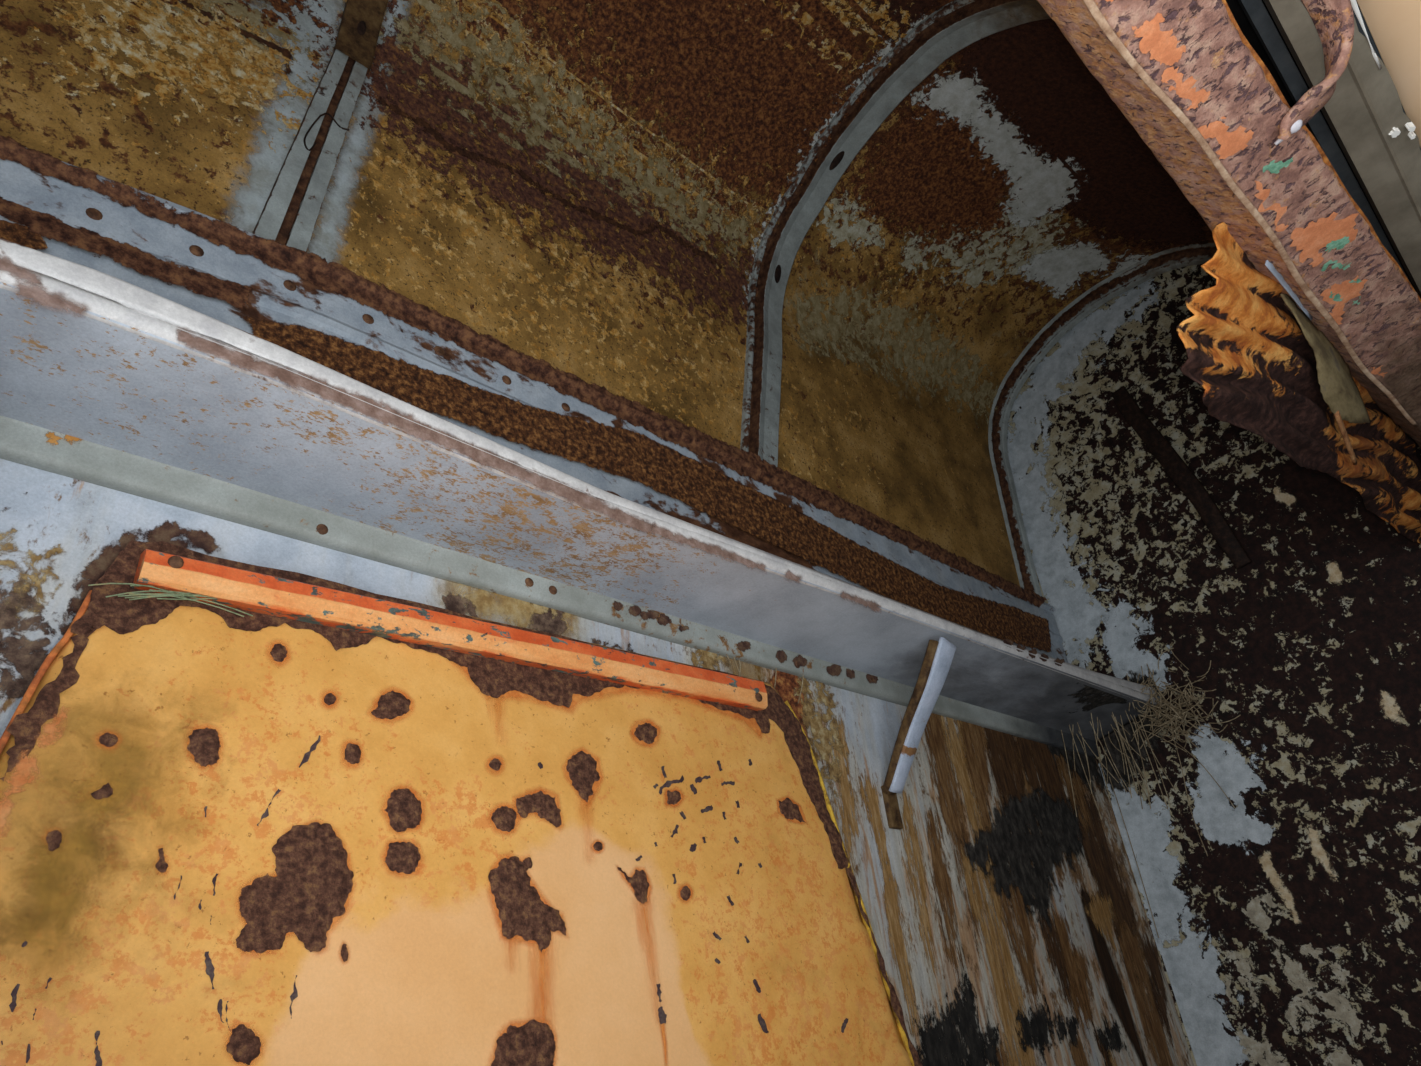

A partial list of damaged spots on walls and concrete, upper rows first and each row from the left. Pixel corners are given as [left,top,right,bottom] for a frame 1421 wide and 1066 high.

rust [357,0,956,356]
rust [830,19,1212,261]
peeling [1132,13,1210,110]
peeling [1195,116,1254,160]
peeling [1255,157,1368,325]
rust [0,135,1065,666]
rust [0,520,219,699]
peeling [1380,691,1403,722]
rust [236,822,354,962]
rust [691,641,1178,1066]
peeling [1099,723,1380,1066]
leakage [912,965,1130,1066]